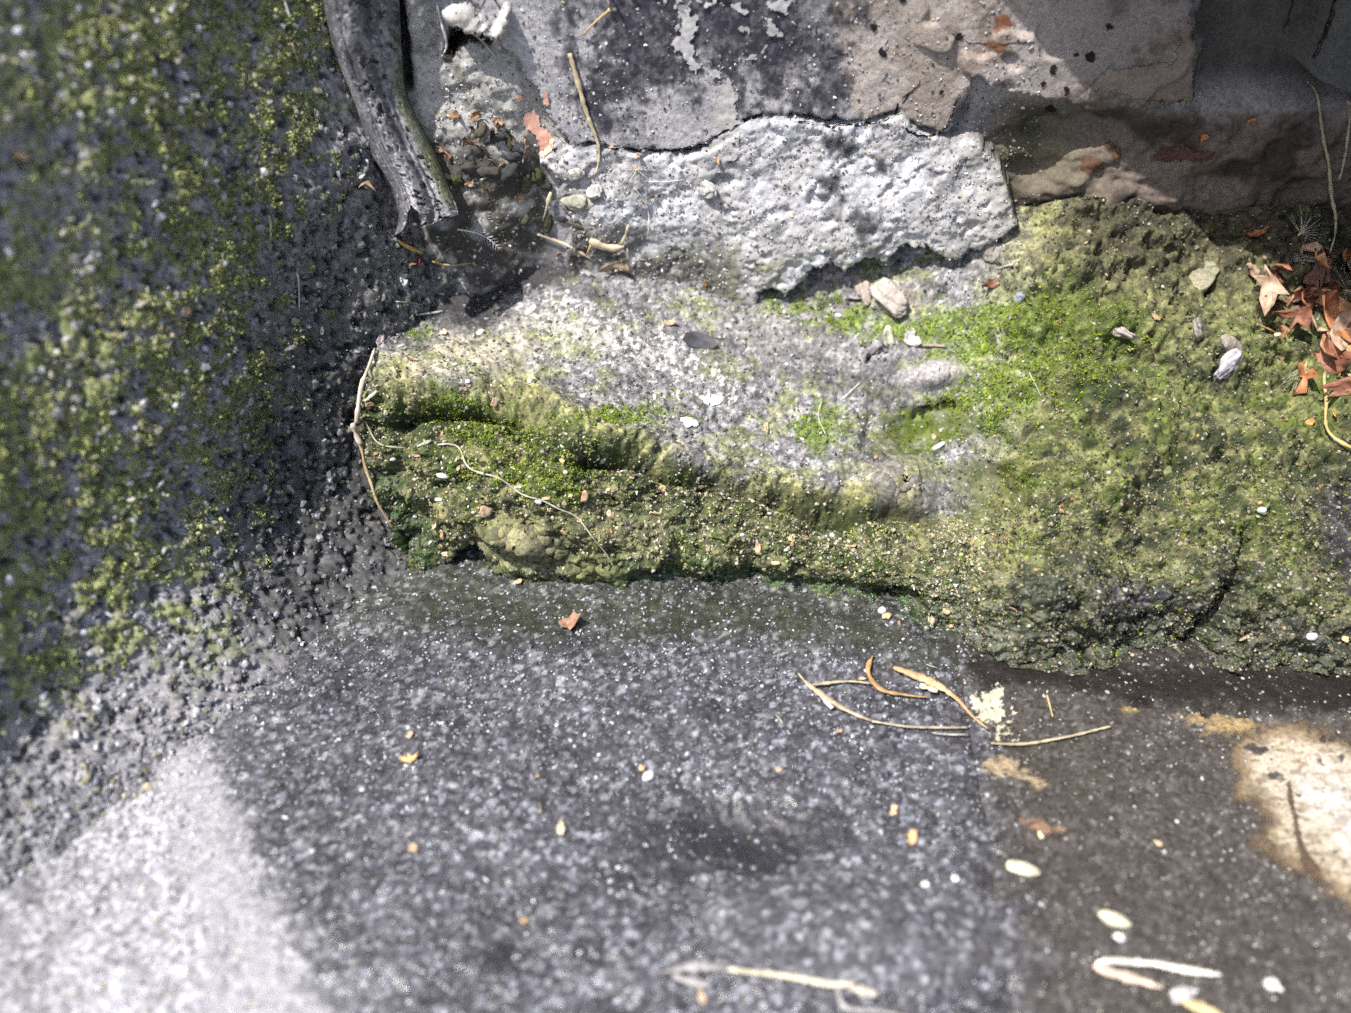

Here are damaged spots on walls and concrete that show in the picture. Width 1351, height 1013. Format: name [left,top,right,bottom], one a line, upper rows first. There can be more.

peeling [442,0,512,62]
peeling [657,0,792,136]
spalling [516,91,554,158]
damp [551,0,943,241]
crack [554,82,960,163]
damp [420,265,587,329]
damp [680,416,699,427]
damp [1322,486,1351,596]
damp [1102,583,1172,627]